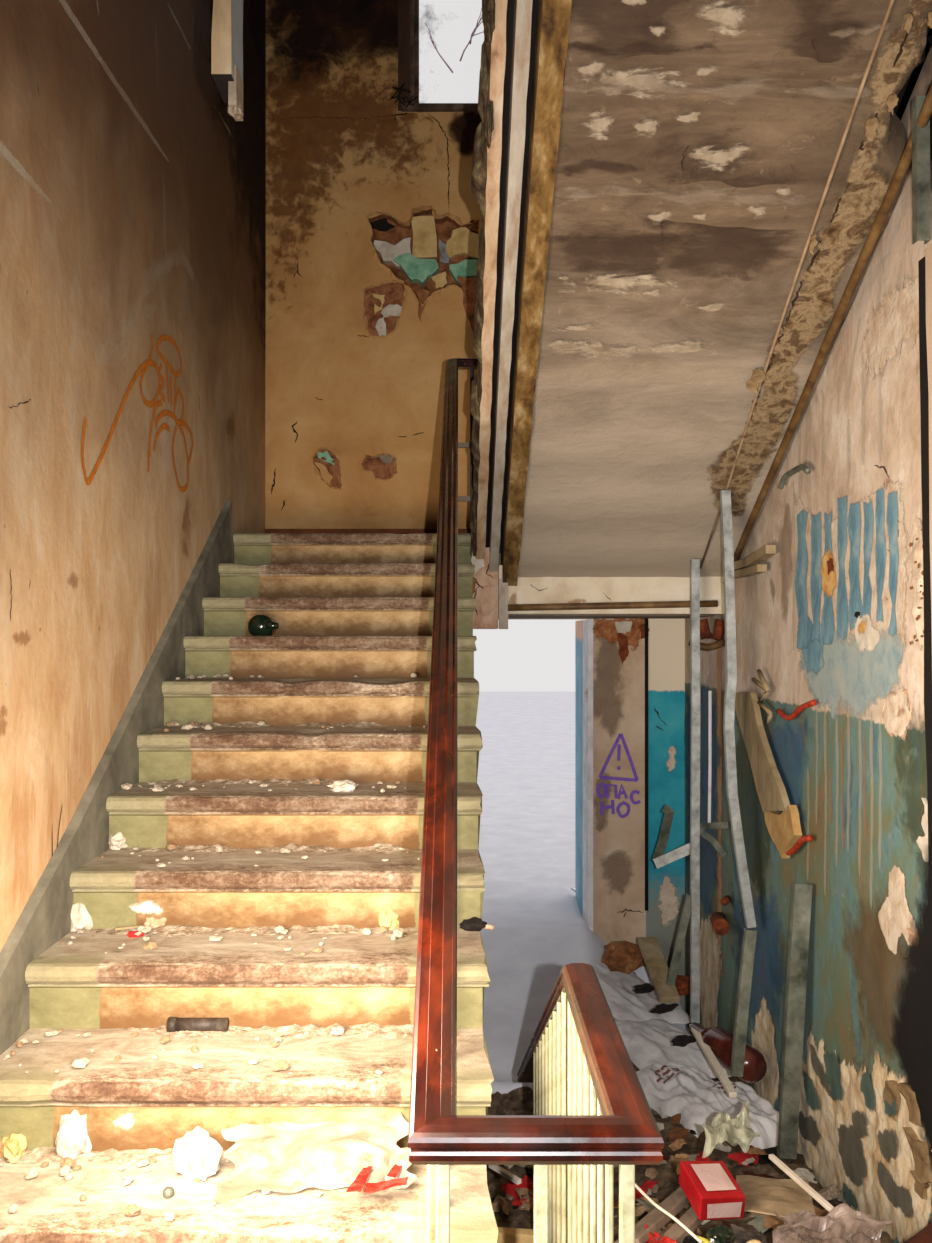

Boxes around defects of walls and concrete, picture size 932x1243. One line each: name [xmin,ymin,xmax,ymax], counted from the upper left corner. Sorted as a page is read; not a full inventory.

damp [571,0,681,56]
damp [266,59,431,269]
damp [558,219,779,277]
spalling [708,0,932,516]
spalling [360,0,496,617]
damp [586,638,621,734]
spalling [593,619,649,664]
peeling [793,480,924,740]
damp [595,775,611,831]
damp [603,852,630,892]
peeling [878,865,915,954]
spalling [797,1032,932,1243]